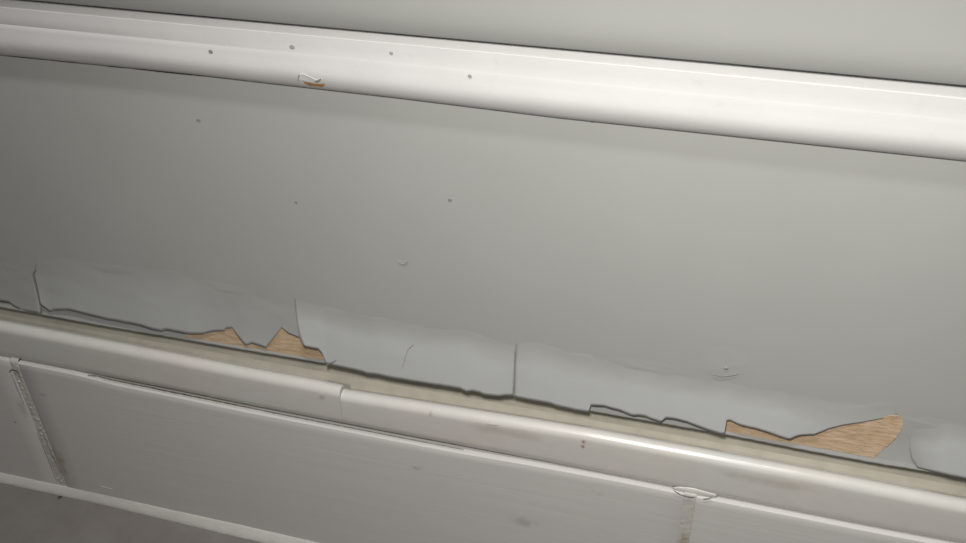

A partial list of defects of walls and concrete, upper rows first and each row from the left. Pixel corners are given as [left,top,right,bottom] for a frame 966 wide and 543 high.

peeling [34,258,903,458]
peeling [910,422,966,479]